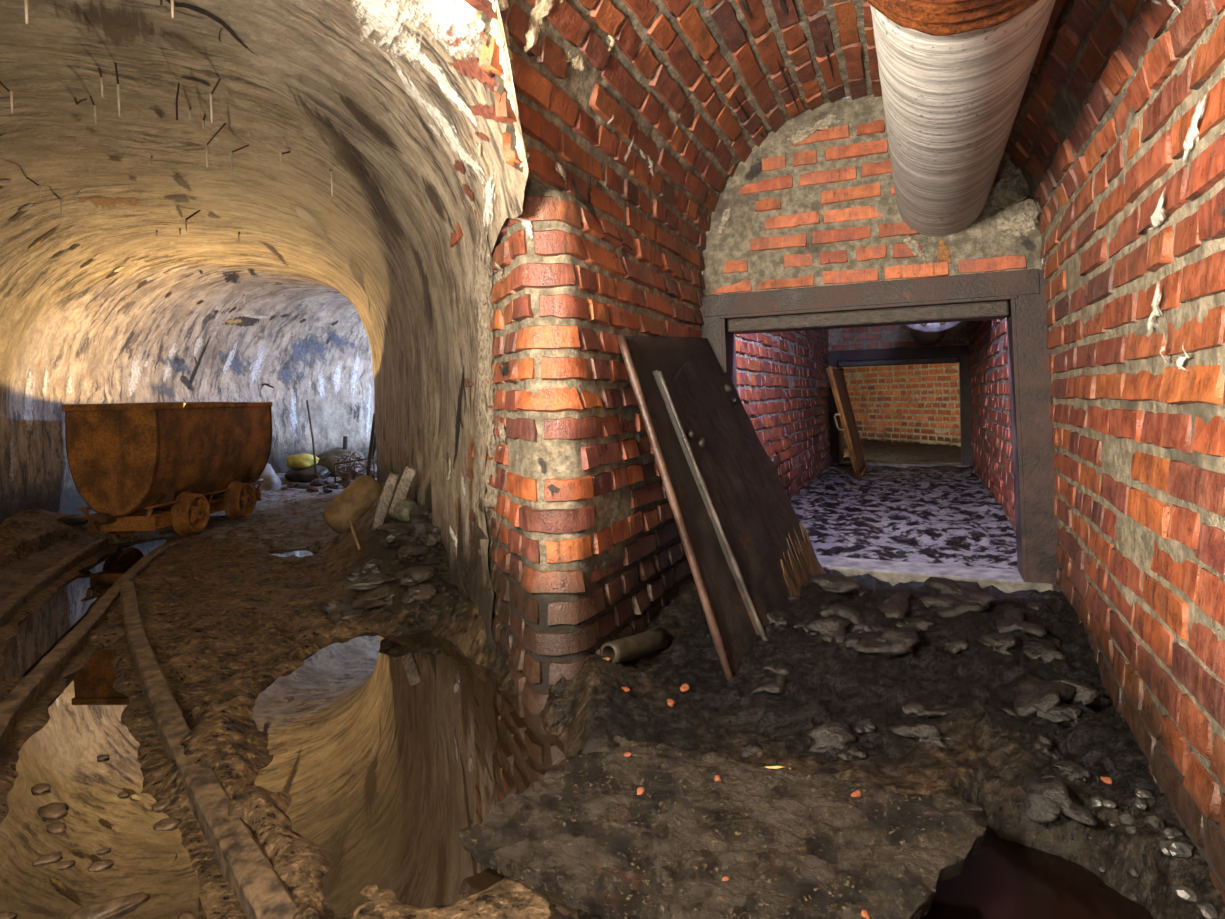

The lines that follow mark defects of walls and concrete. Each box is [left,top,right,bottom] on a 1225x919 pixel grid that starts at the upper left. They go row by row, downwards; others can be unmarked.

crack [166,0,255,54]
flaking render [436,25,503,143]
flaking render [454,160,473,202]